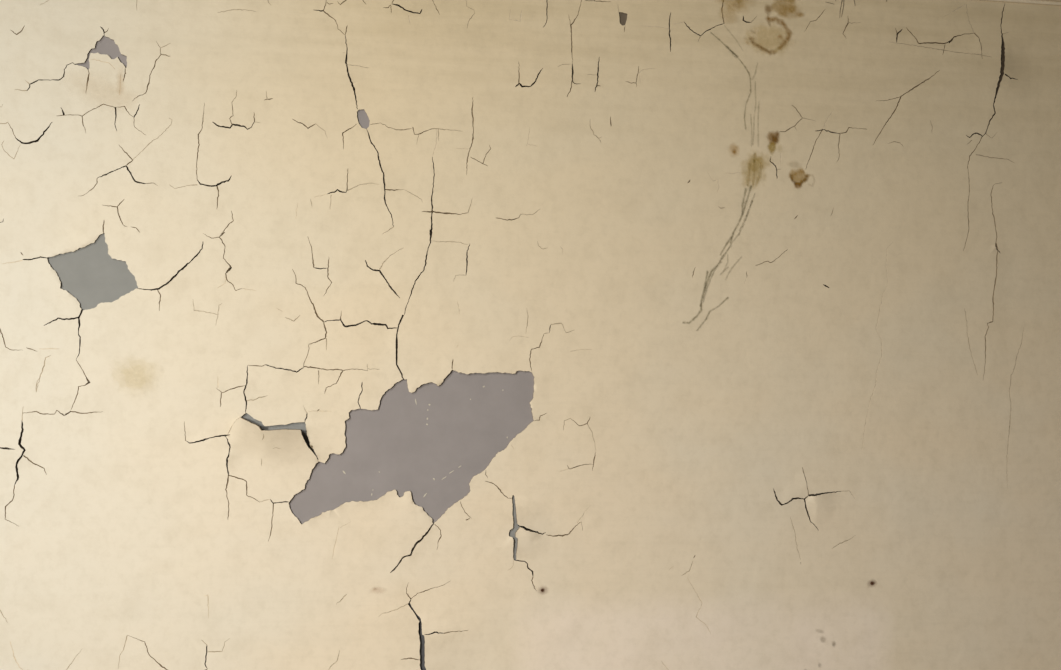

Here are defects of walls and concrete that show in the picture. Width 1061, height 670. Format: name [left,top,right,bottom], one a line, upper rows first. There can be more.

peeling [75,35,127,70]
crack [0,26,273,321]
peeling [357,109,370,129]
crack [509,0,757,97]
crack [781,4,1018,376]
peeling [47,233,138,310]
crack [184,0,491,541]
crack [0,309,103,526]
peeling [289,370,534,524]
crack [382,523,468,670]
crack [485,473,590,591]
crack [773,467,856,563]